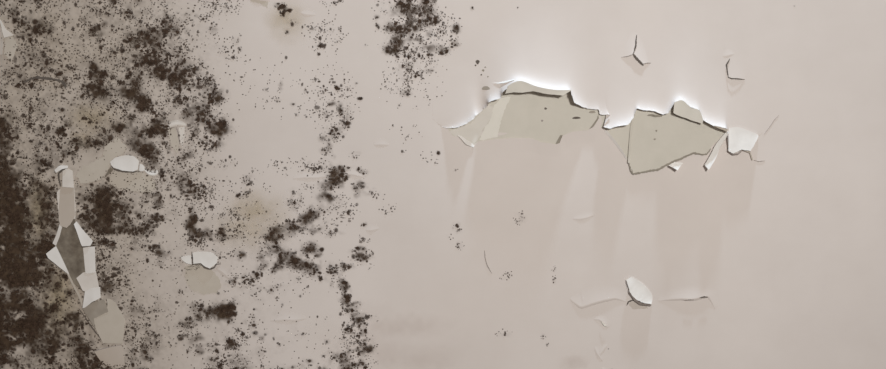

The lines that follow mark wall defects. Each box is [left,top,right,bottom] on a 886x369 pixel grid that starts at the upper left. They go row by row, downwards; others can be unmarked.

leakage [374,0,462,104]
peeling [433,0,779,175]
peeling [46,138,158,368]
leakage [0,0,395,369]
peeling [181,252,231,295]
peeling [626,277,652,309]